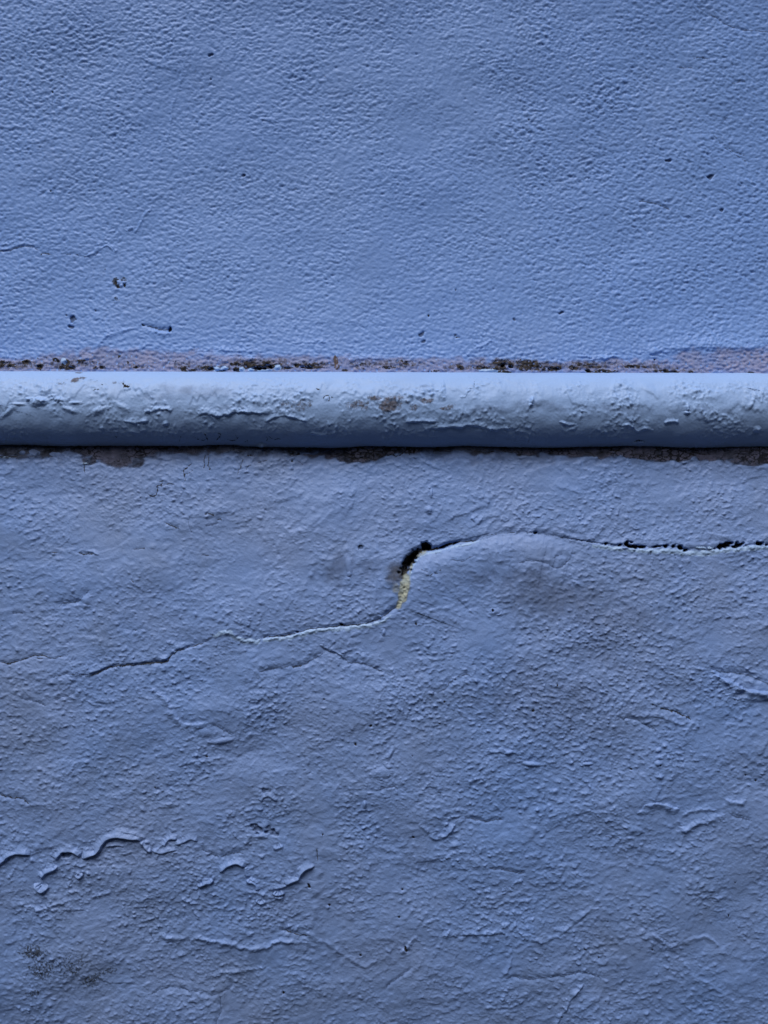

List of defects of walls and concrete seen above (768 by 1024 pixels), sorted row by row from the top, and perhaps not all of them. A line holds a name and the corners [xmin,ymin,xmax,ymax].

crack [259,531,767,675]